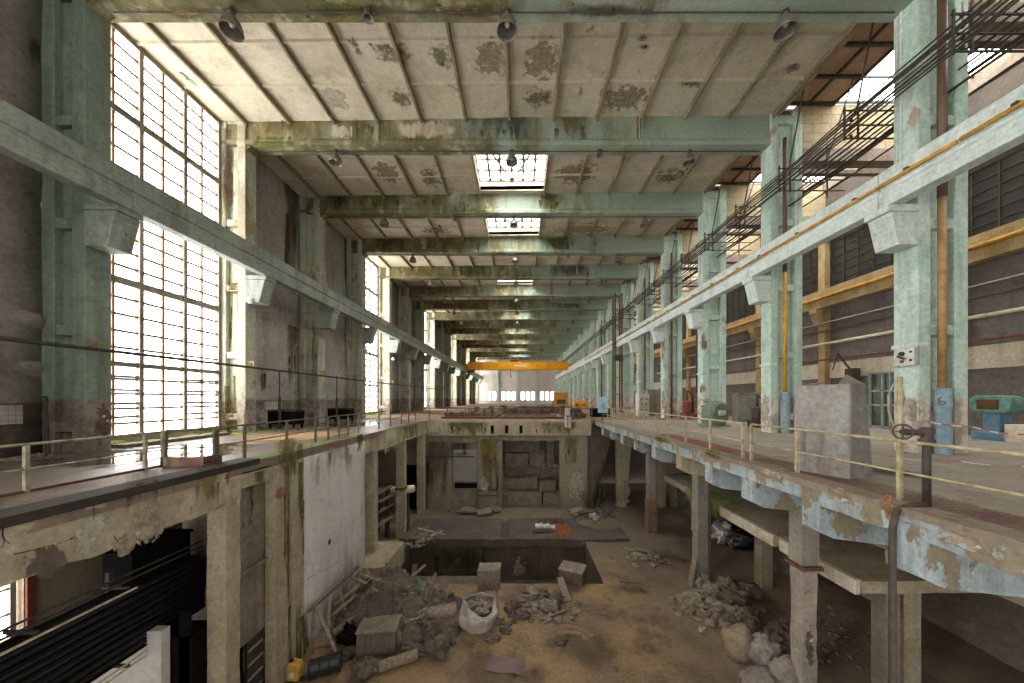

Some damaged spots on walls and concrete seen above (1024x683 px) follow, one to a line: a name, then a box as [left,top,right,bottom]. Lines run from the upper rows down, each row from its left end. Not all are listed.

peeling [474,36,560,108]
peeling [598,84,656,111]
damp [330,120,373,138]
damp [398,120,455,139]
damp [481,117,528,137]
peeling [371,160,401,184]
peeling [554,163,599,185]
spalling [75,500,167,557]
damp [284,489,304,591]
spalling [22,542,67,580]